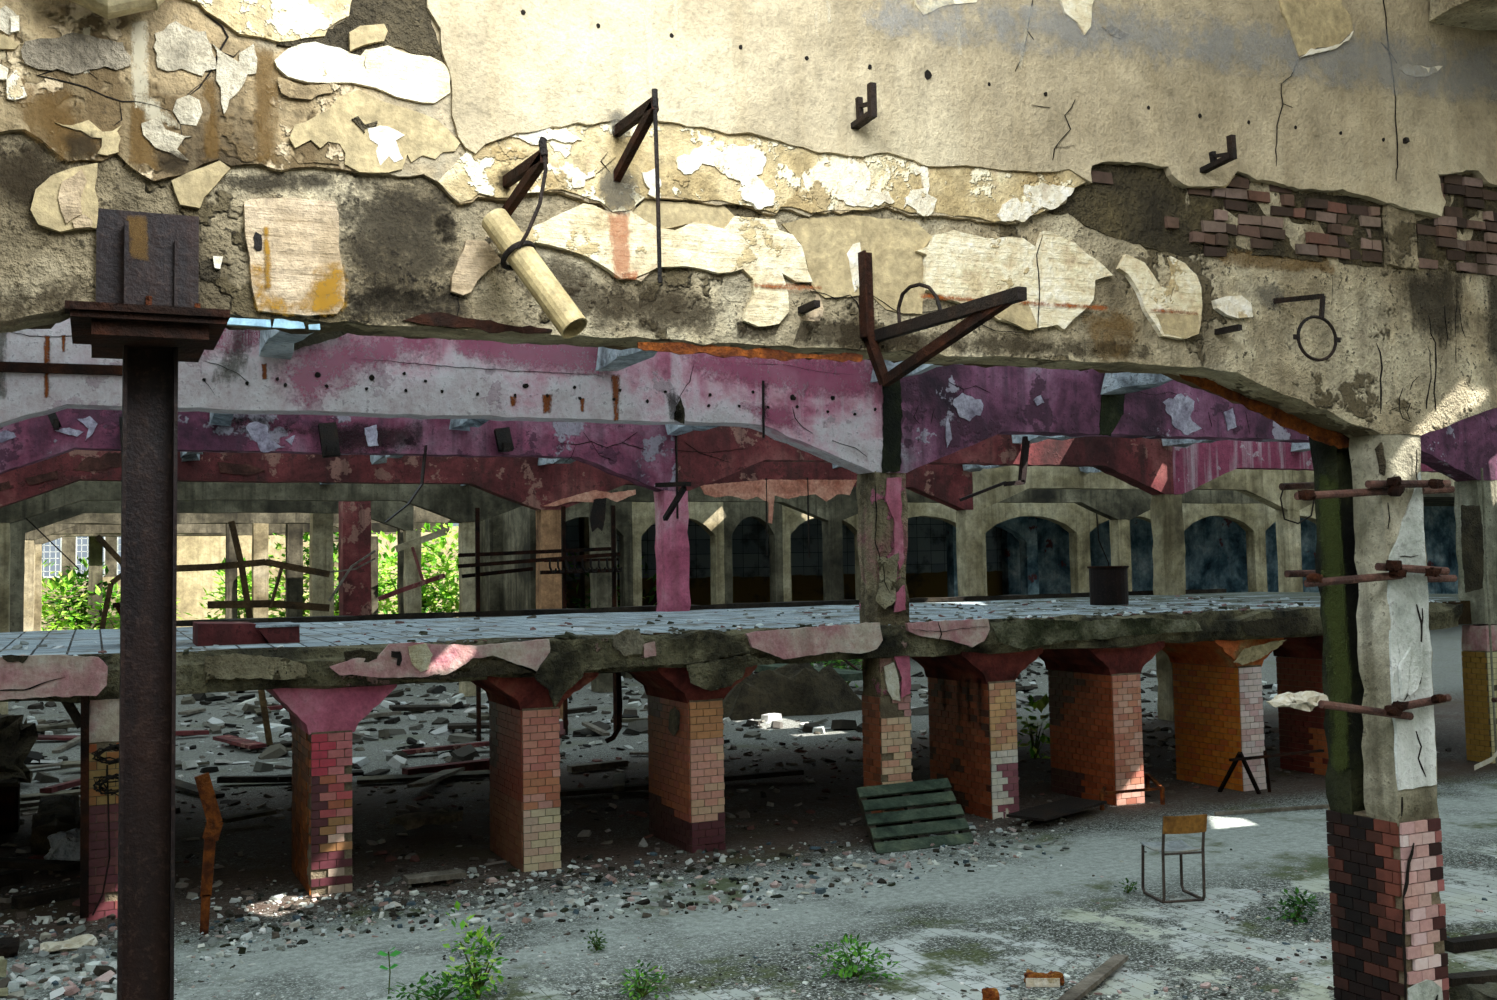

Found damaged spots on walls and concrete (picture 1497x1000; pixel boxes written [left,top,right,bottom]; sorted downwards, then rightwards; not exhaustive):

leakage [0,88,96,204]
leakage [130,103,187,173]
flaking render [0,0,1497,340]
crack [1275,59,1298,165]
crack [1381,0,1398,181]
corrosion [129,217,147,258]
leakage [213,49,464,434]
spalling [272,319,347,351]
leakage [545,258,715,332]
corrosion [1019,301,1107,310]
spalling [1163,374,1349,449]
flaking render [330,477,1202,707]